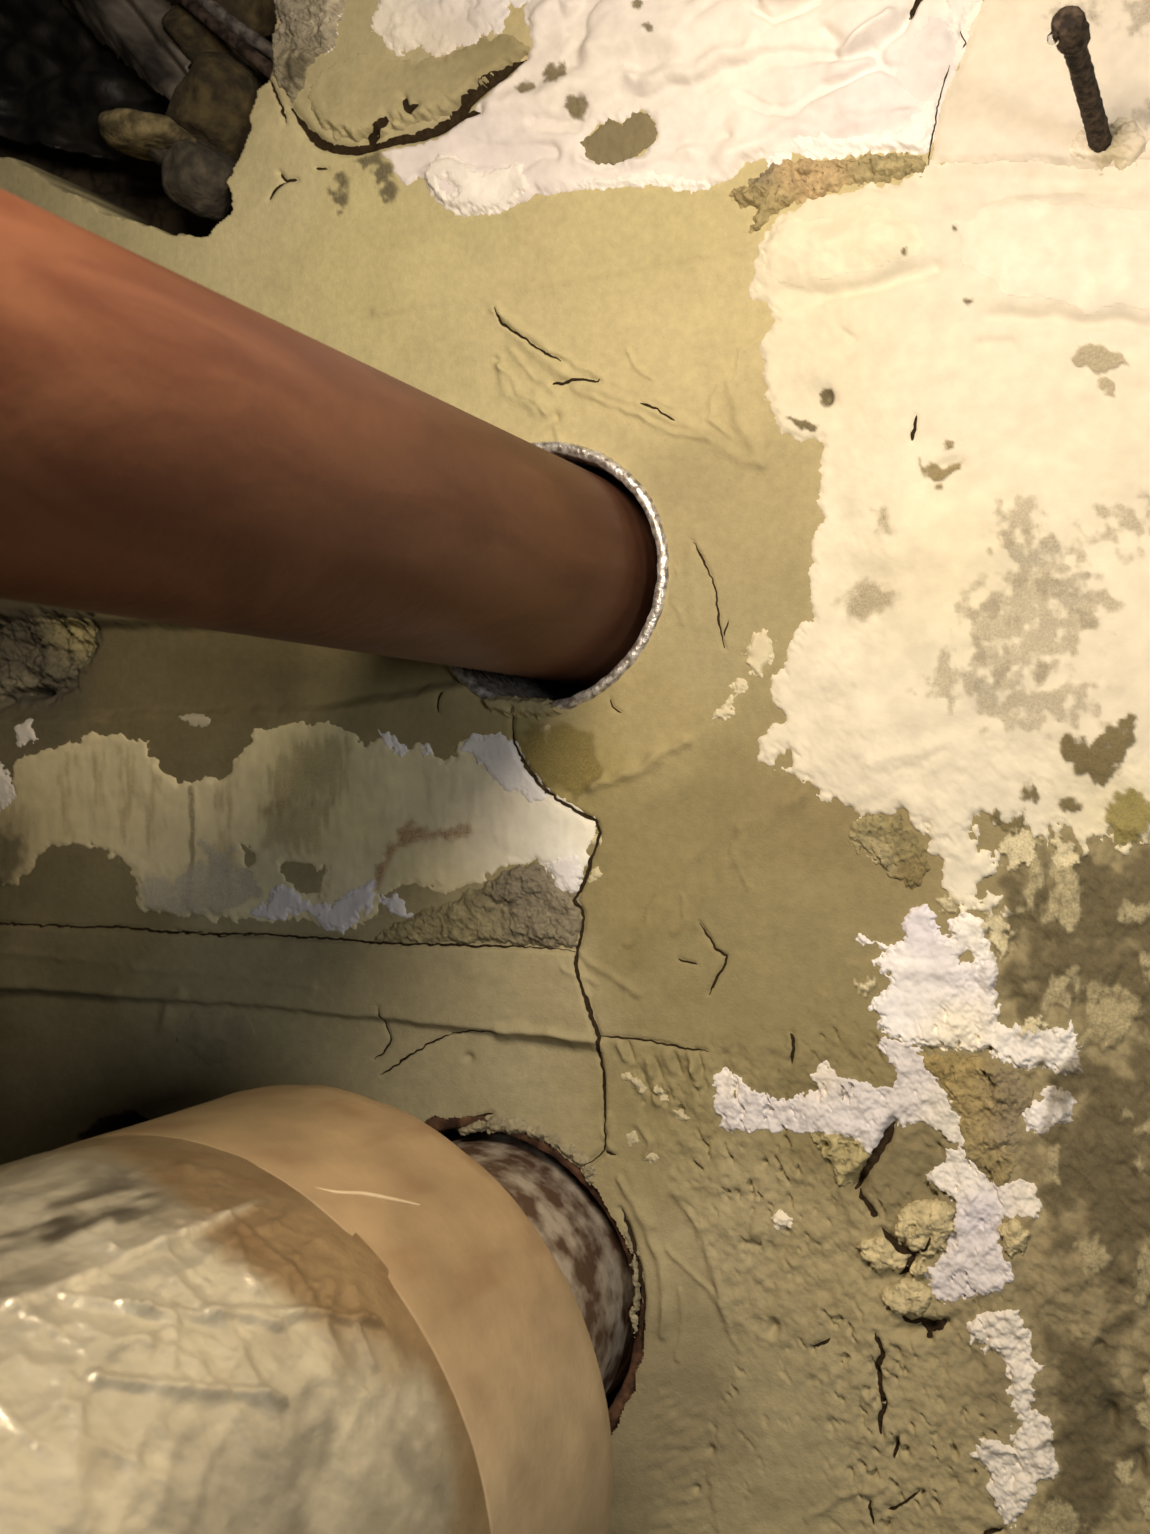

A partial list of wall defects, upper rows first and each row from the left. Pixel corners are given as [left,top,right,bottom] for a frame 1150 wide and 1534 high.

spalling [271,0,346,103]
peeling [178,713,211,728]
peeling [0,718,603,951]
crack [0,708,709,1165]
peeling [370,0,1150,1529]
leakage [936,515,1150,1028]
crack [622,1209,646,1346]
leakage [1028,1052,1150,1534]